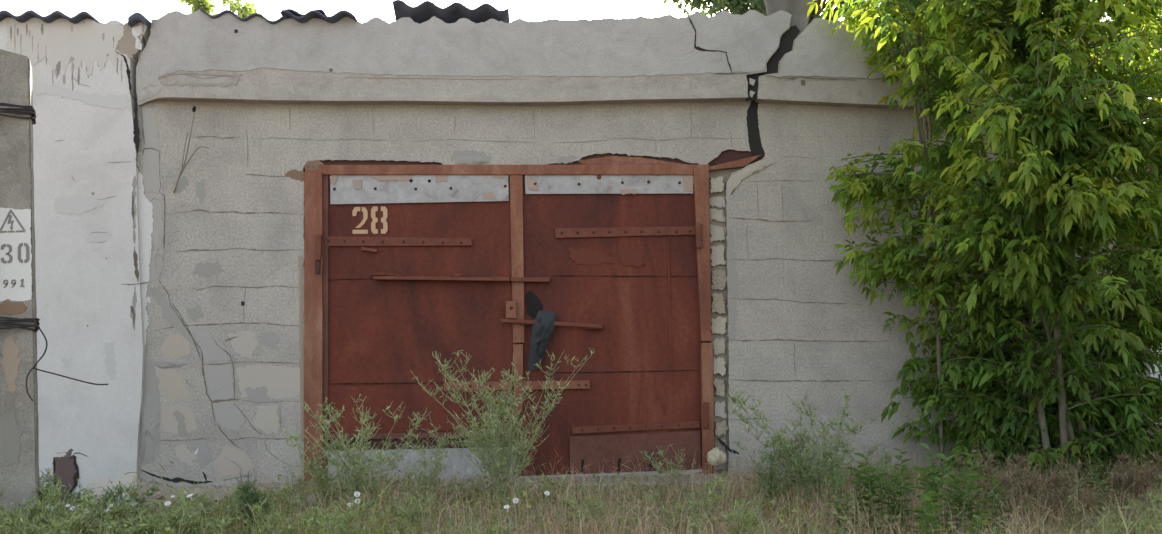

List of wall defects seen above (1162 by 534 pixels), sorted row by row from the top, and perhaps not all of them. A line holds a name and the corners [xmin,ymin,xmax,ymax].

peeling [138,171,153,359]
crack [55,35,301,484]
corrosion [285,169,304,181]
crack [200,18,890,454]
peeling [158,334,198,466]
peeling [212,445,255,477]
peeling [228,329,300,434]